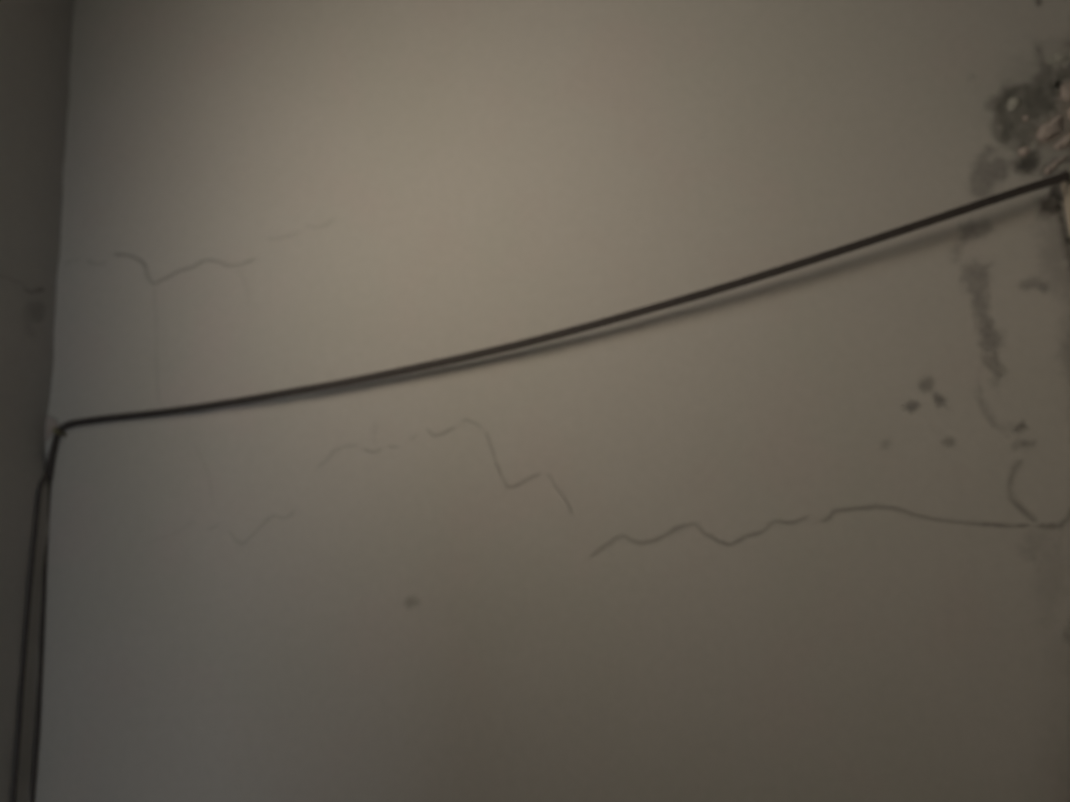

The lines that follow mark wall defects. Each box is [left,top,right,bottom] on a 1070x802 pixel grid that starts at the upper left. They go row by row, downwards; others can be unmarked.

spalling [1005,81,1070,174]